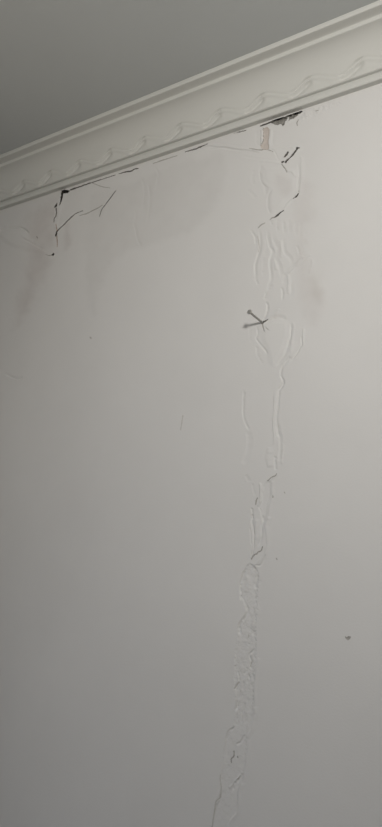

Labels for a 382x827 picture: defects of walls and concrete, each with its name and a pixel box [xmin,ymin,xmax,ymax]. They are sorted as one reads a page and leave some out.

peeling [255,101,342,150]
crack [51,144,207,245]